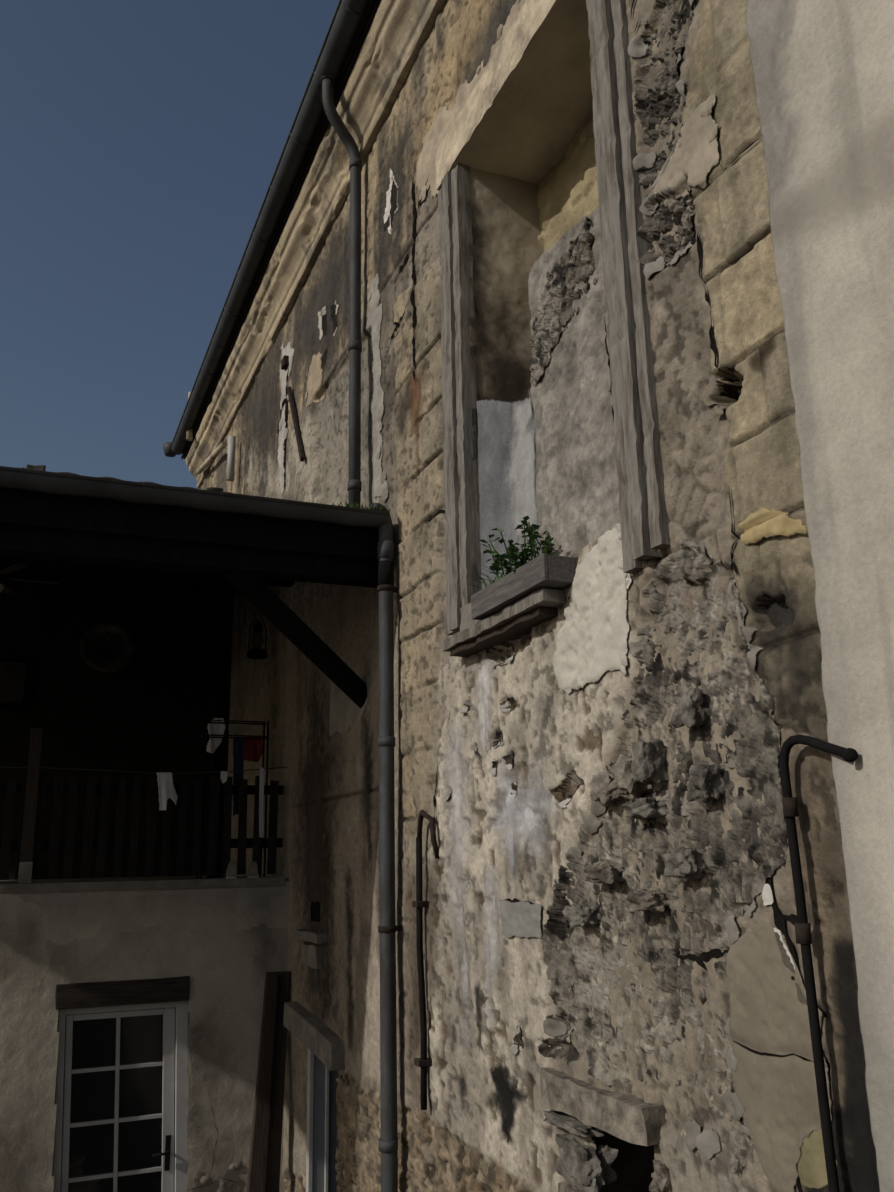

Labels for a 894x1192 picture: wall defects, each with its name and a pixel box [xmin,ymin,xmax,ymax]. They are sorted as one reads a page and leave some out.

peeling [277,341,294,493]
peeling [305,301,339,407]
peeling [383,168,398,234]
crack [388,163,428,381]
peeling [416,0,526,202]
spalling [509,216,596,537]
spalling [628,0,719,279]
peeling [738,508,808,544]
spalling [538,523,788,1176]
water stain [491,1066,522,1142]
spalling [592,1132,667,1192]
water stain [805,941,880,1192]